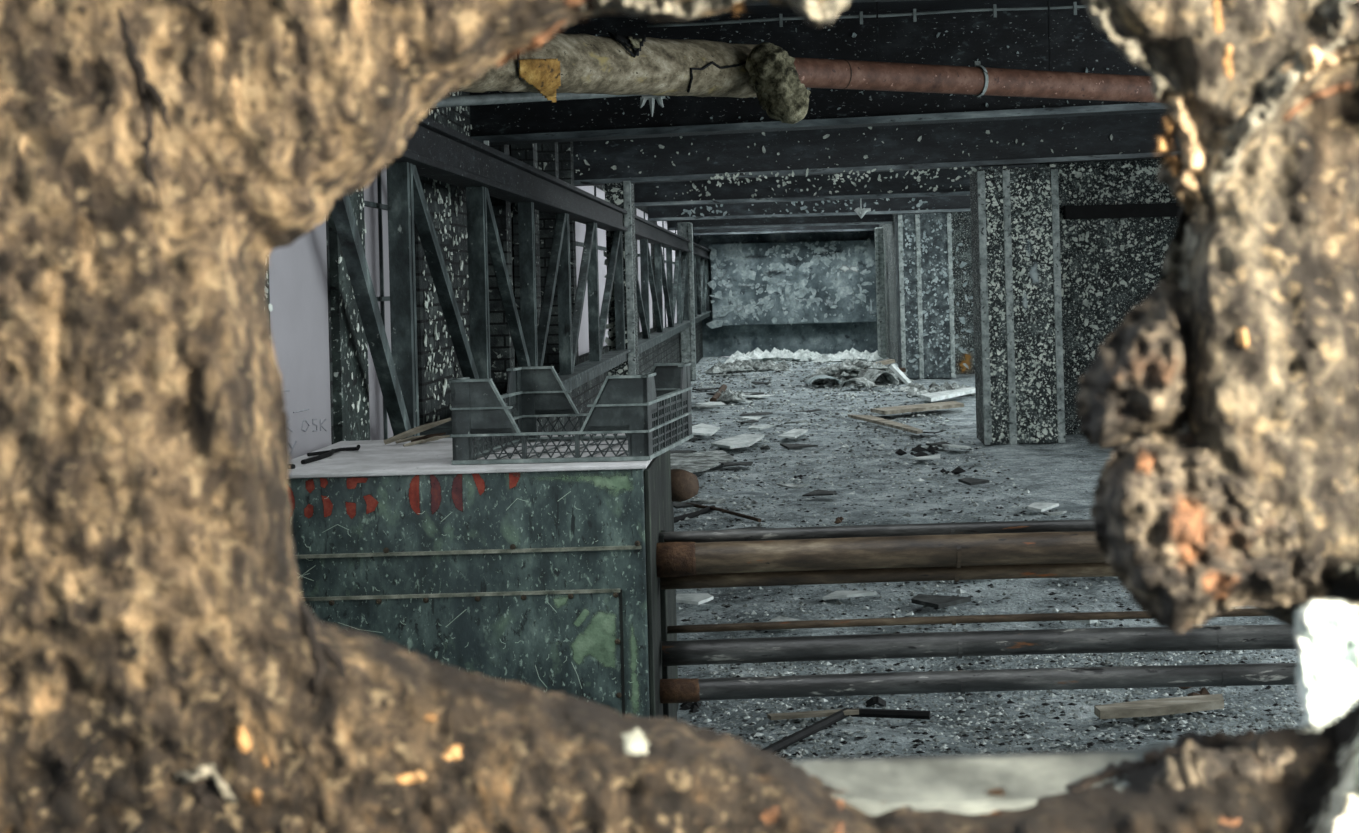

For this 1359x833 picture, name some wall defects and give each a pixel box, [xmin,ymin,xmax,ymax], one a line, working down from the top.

crack [118,6,170,211]
peeling [429,91,472,136]
peeling [603,188,624,220]
peeling [576,136,709,175]
peeling [340,278,370,425]
peeling [423,179,469,422]
peeling [603,231,628,376]
peeling [655,117,1170,442]
spalling [1065,729,1296,794]